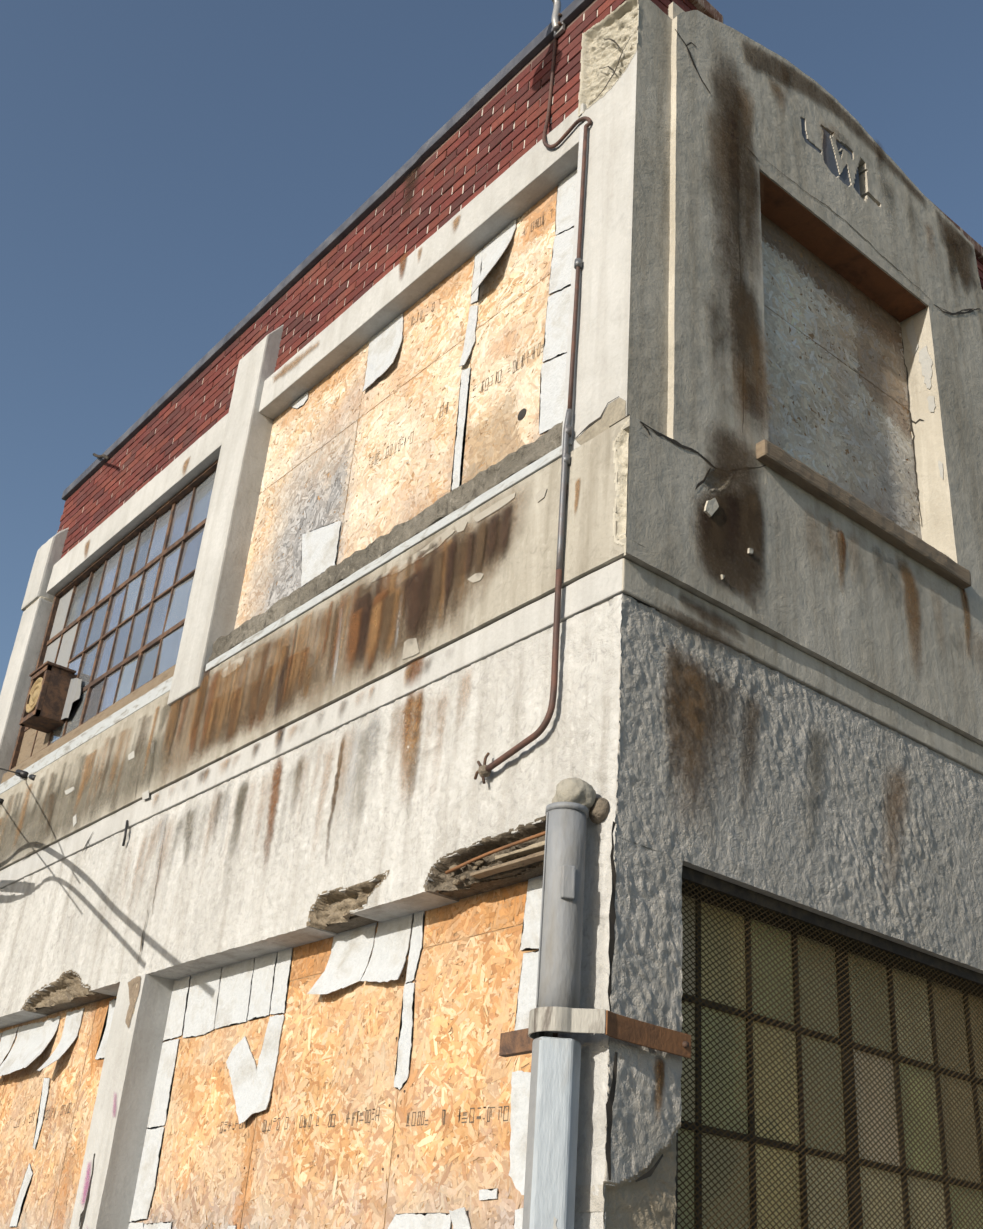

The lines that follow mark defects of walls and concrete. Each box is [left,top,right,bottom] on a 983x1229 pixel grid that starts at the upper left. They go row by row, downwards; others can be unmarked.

spalling [578,0,639,116]
leakage [745,44,923,200]
leakage [716,64,760,405]
crack [575,396,619,439]
crack [640,421,715,490]
leakage [697,433,763,598]
rust [402,694,422,777]
rust [267,762,281,837]
rust [328,740,343,831]
spalling [423,815,546,892]
spalling [306,870,389,930]
flaking render [603,1122,681,1229]